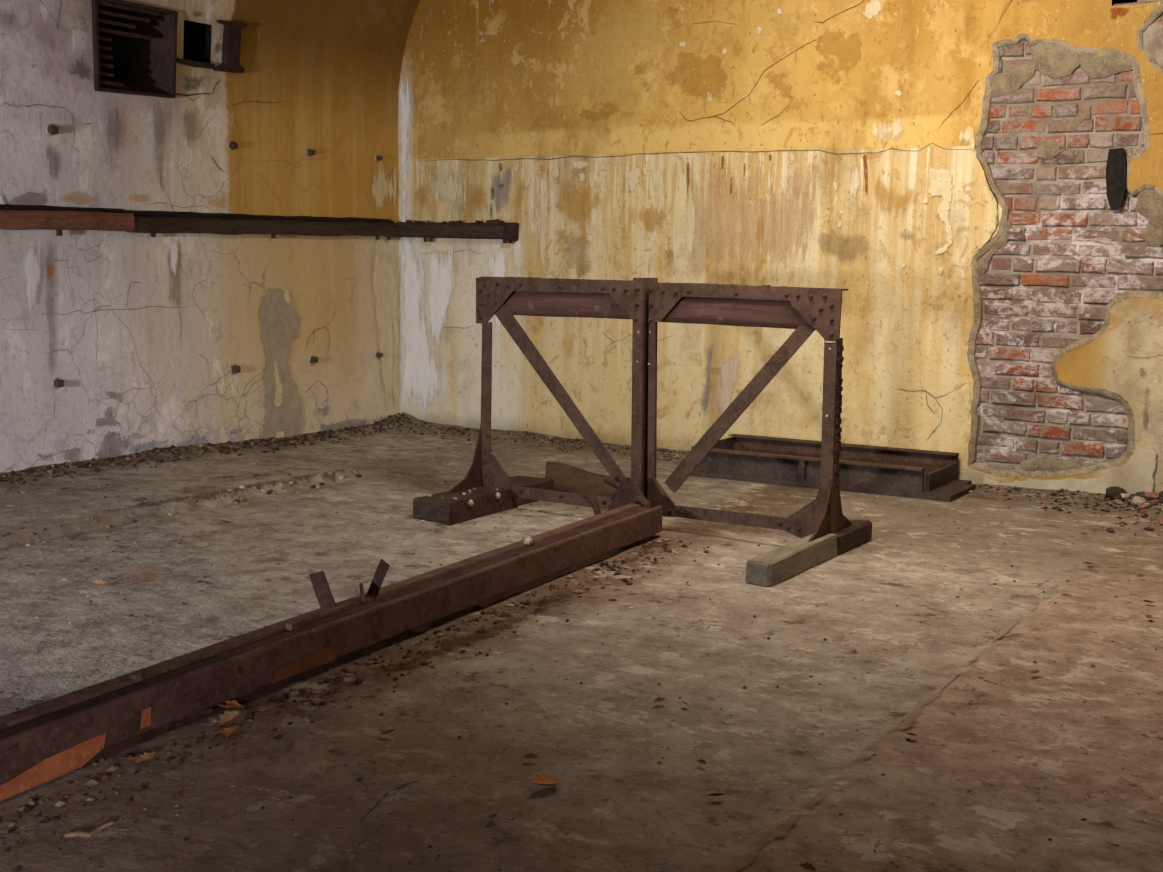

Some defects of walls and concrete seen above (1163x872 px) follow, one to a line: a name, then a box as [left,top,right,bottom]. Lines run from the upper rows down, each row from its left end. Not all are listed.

crack [428,0,999,252]
damp [687,167,816,272]
flaking render [960,0,1163,495]
crack [0,253,207,359]
crack [182,354,231,418]